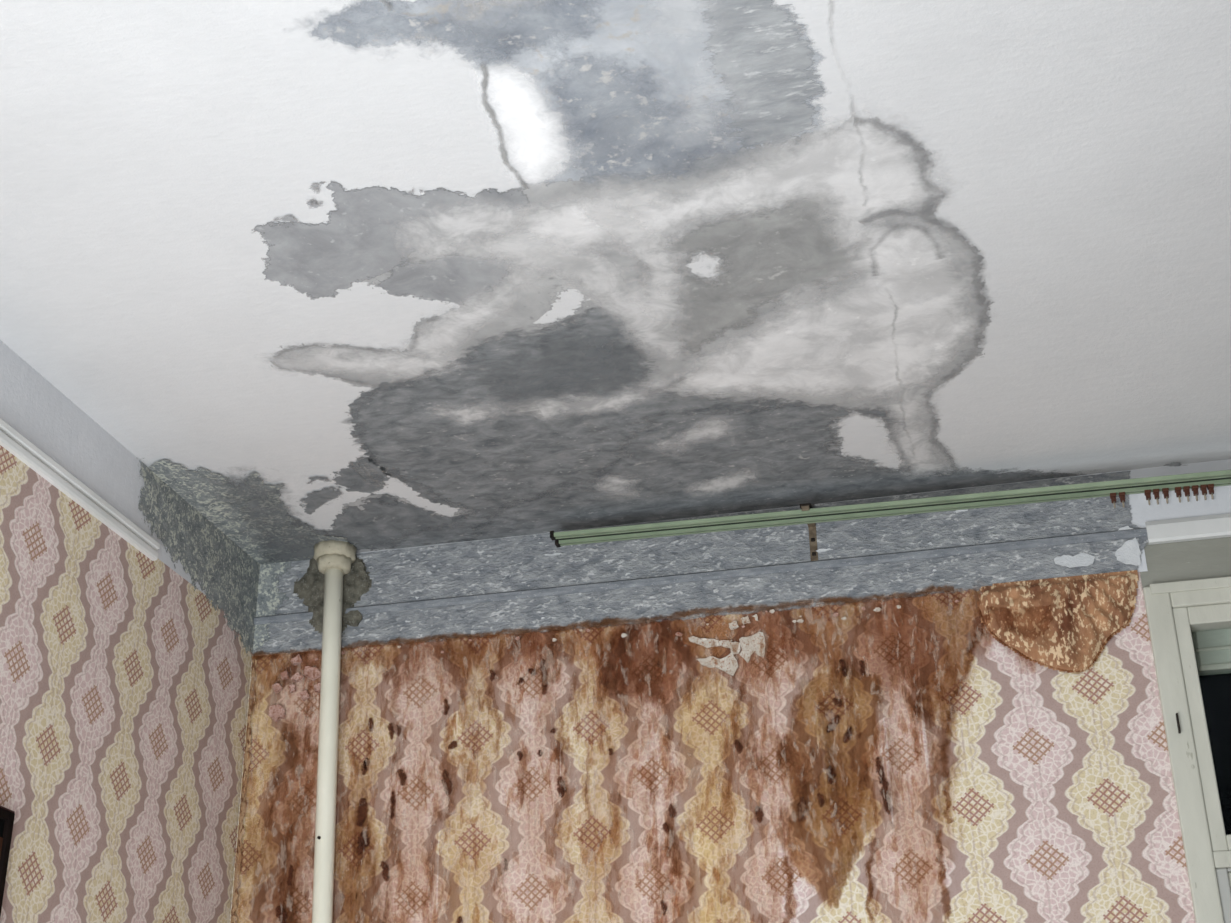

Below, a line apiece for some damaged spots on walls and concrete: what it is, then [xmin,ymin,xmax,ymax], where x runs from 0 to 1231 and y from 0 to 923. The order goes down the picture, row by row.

crack [482,66,528,190]
leakage [139,0,1084,692]
flaking render [253,557,325,694]
flaking render [341,471,1148,676]
leakage [823,587,959,702]
leakage [264,875,307,923]
leakage [843,775,873,918]